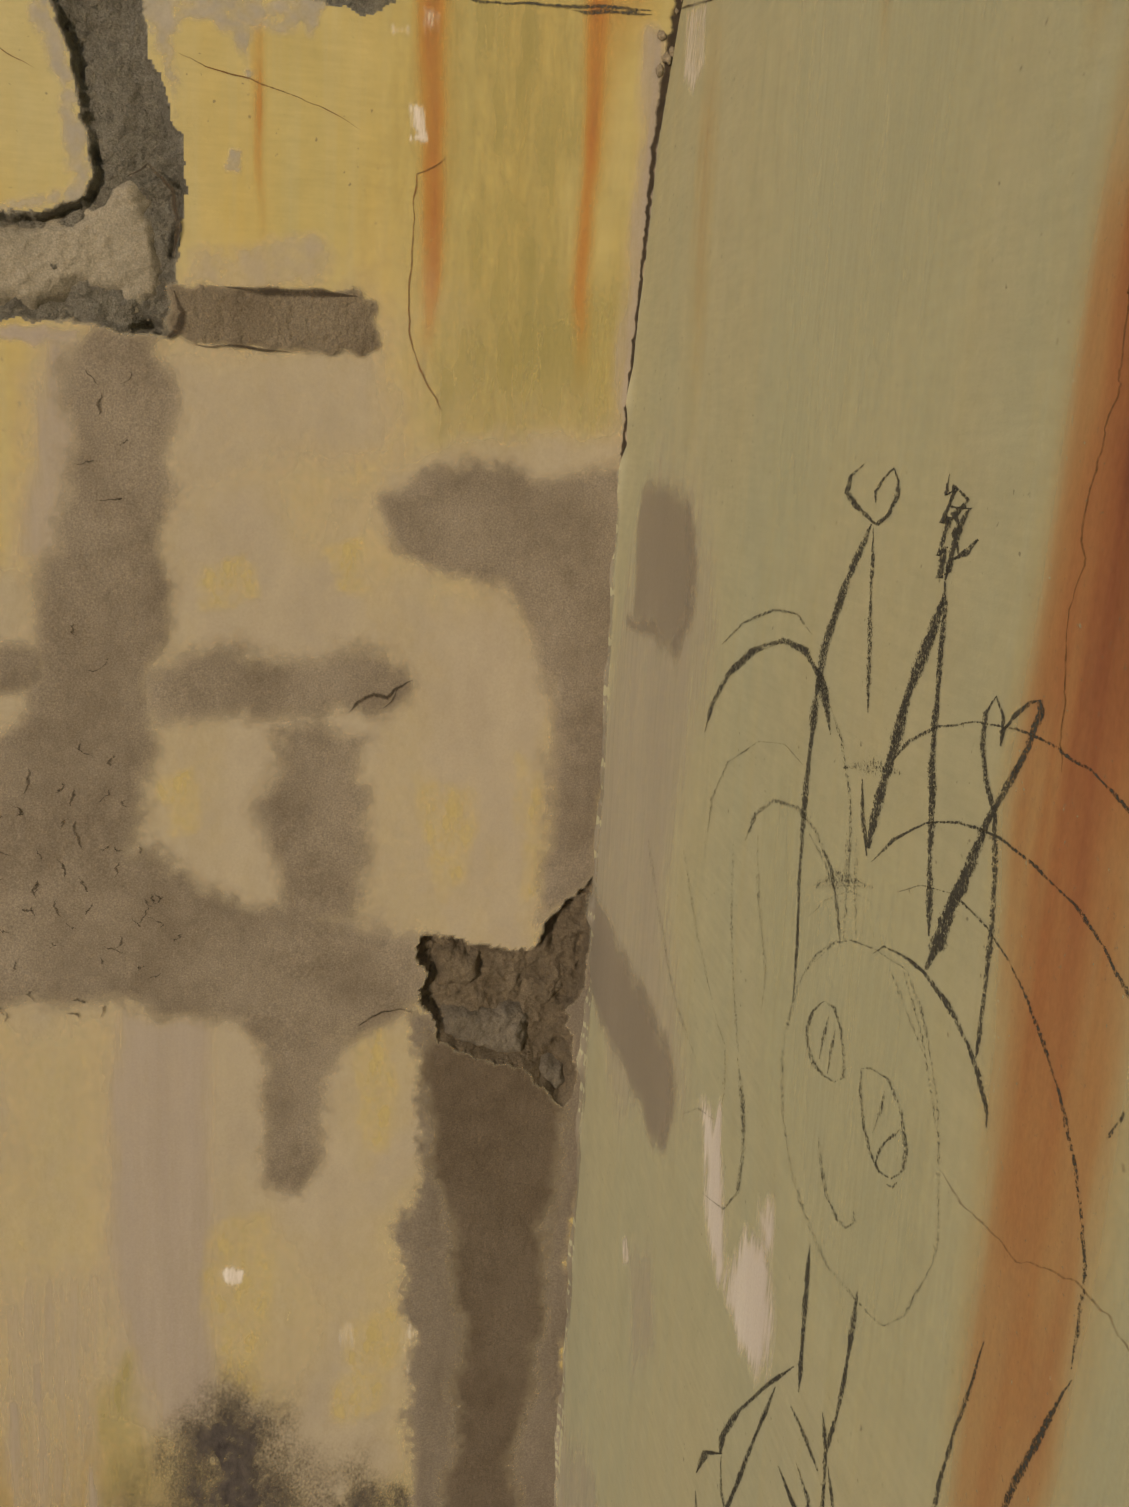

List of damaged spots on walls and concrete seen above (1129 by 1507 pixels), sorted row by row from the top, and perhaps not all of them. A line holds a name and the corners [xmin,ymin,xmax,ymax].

corrosion [419,0,445,324]
corrosion [575,0,610,326]
crack [620,0,712,459]
corrosion [954,145,1129,1507]
spalling [414,876,593,1108]
water stain [587,890,674,1146]
water stain [158,1393,410,1507]